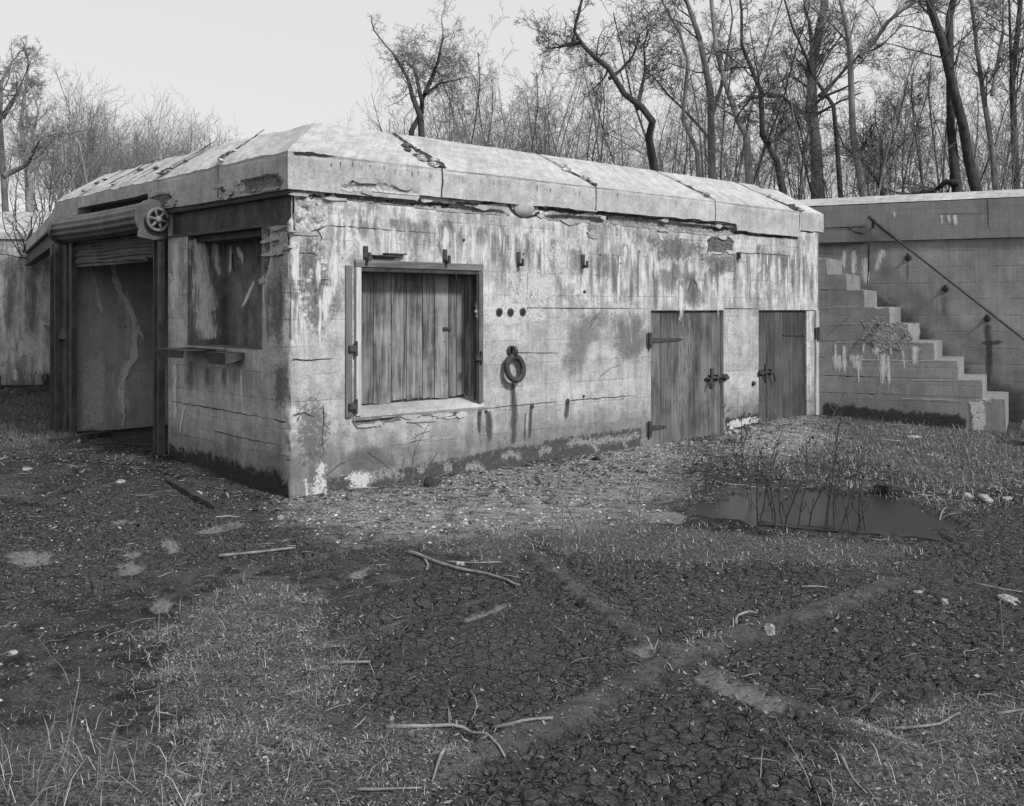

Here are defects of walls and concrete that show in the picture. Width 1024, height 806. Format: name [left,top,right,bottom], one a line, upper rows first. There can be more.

crack [272,131,496,269]
spalling [211,174,510,352]
leakage [346,214,597,305]
spalling [537,213,739,276]
efflorescence [842,250,885,282]
efflorescence [291,248,340,350]
leakage [833,296,929,383]
efflorescence [304,462,327,496]
leakage [369,464,427,483]
leakage [444,460,485,473]
leakage [565,432,641,453]